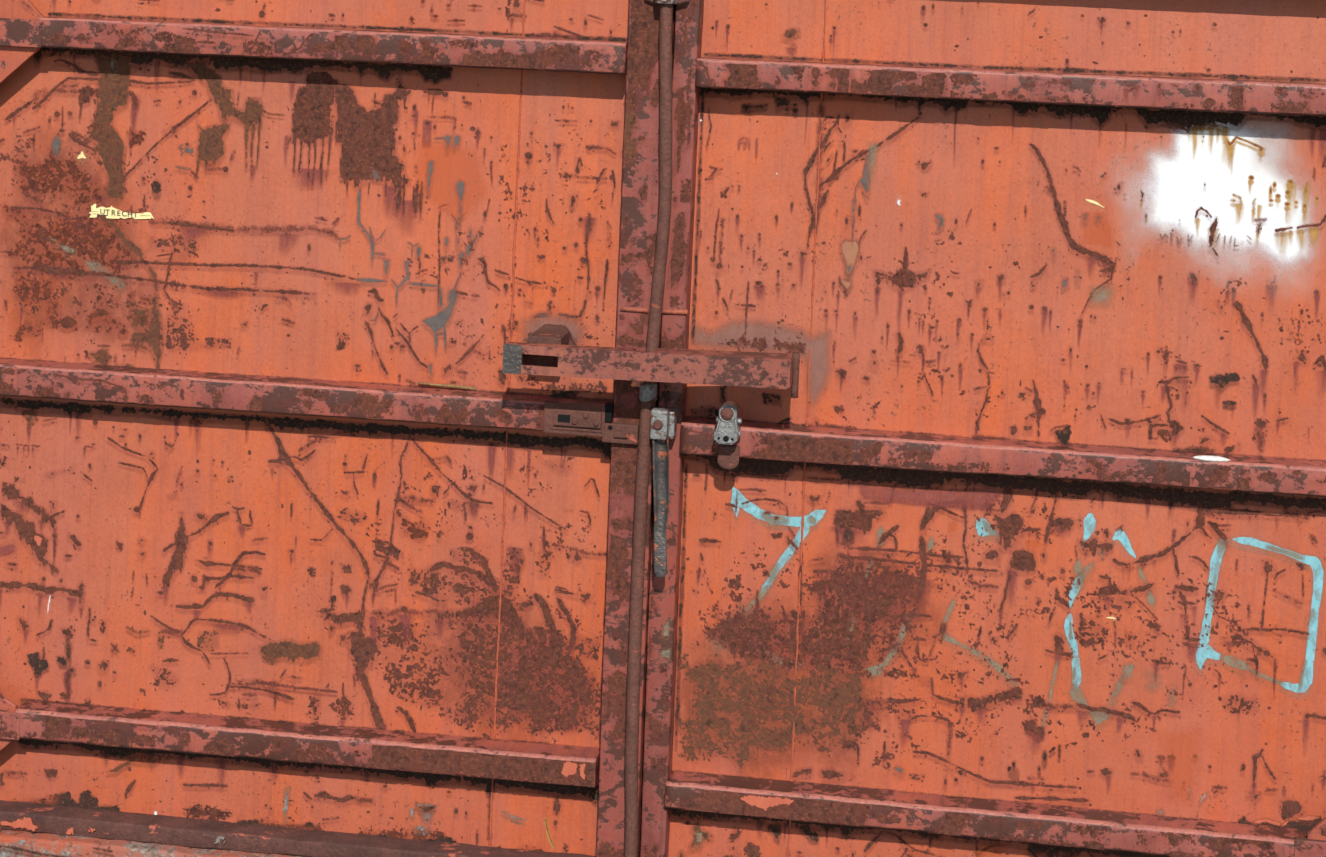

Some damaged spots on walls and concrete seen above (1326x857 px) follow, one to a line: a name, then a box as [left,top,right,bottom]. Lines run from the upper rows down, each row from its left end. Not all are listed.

corrosion [0,14,436,405]
corrosion [395,0,740,430]
corrosion [646,247,1326,791]
peeling [0,817,38,831]
corrosion [563,838,624,857]
corrosion [679,790,914,857]
corrosion [928,812,1107,857]
corrosion [1135,829,1278,857]
corrosion [1250,787,1303,820]